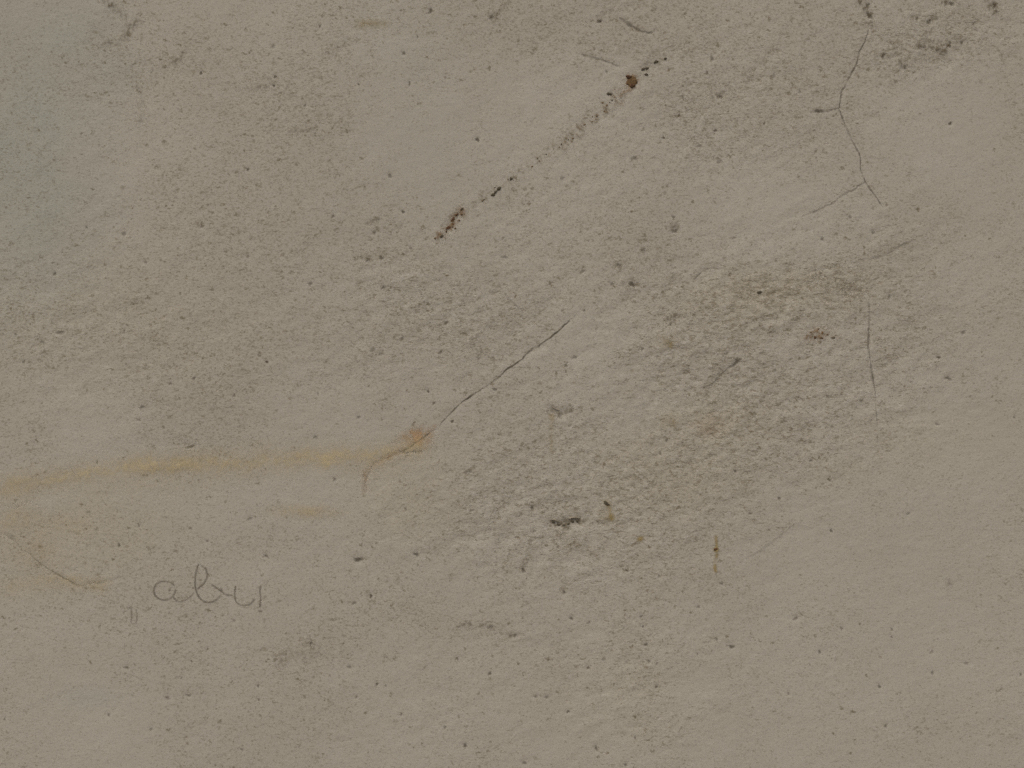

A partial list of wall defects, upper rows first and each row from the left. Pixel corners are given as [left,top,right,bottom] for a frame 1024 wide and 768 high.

corrosion [626,75,638,88]
crack [402,321,569,452]